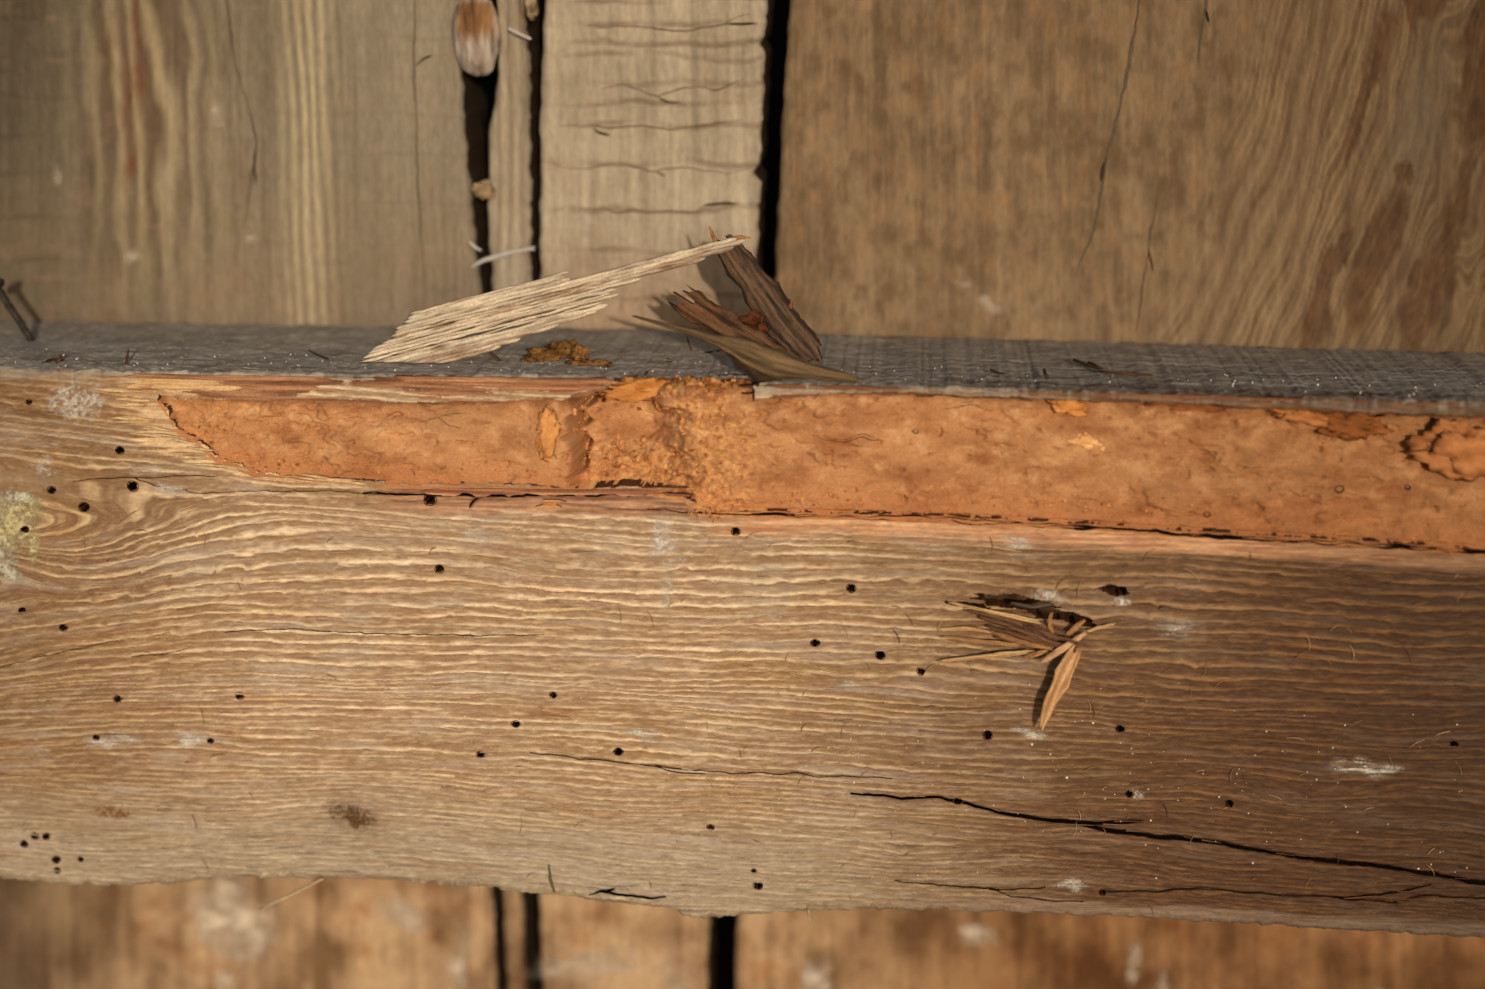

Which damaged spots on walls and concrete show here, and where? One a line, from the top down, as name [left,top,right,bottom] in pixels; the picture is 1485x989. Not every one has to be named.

crack [225,0,258,222]
crack [1075,0,1140,276]
crack [1136,205,1157,333]
spalling [155,358,1485,556]
crack [530,752,1485,904]